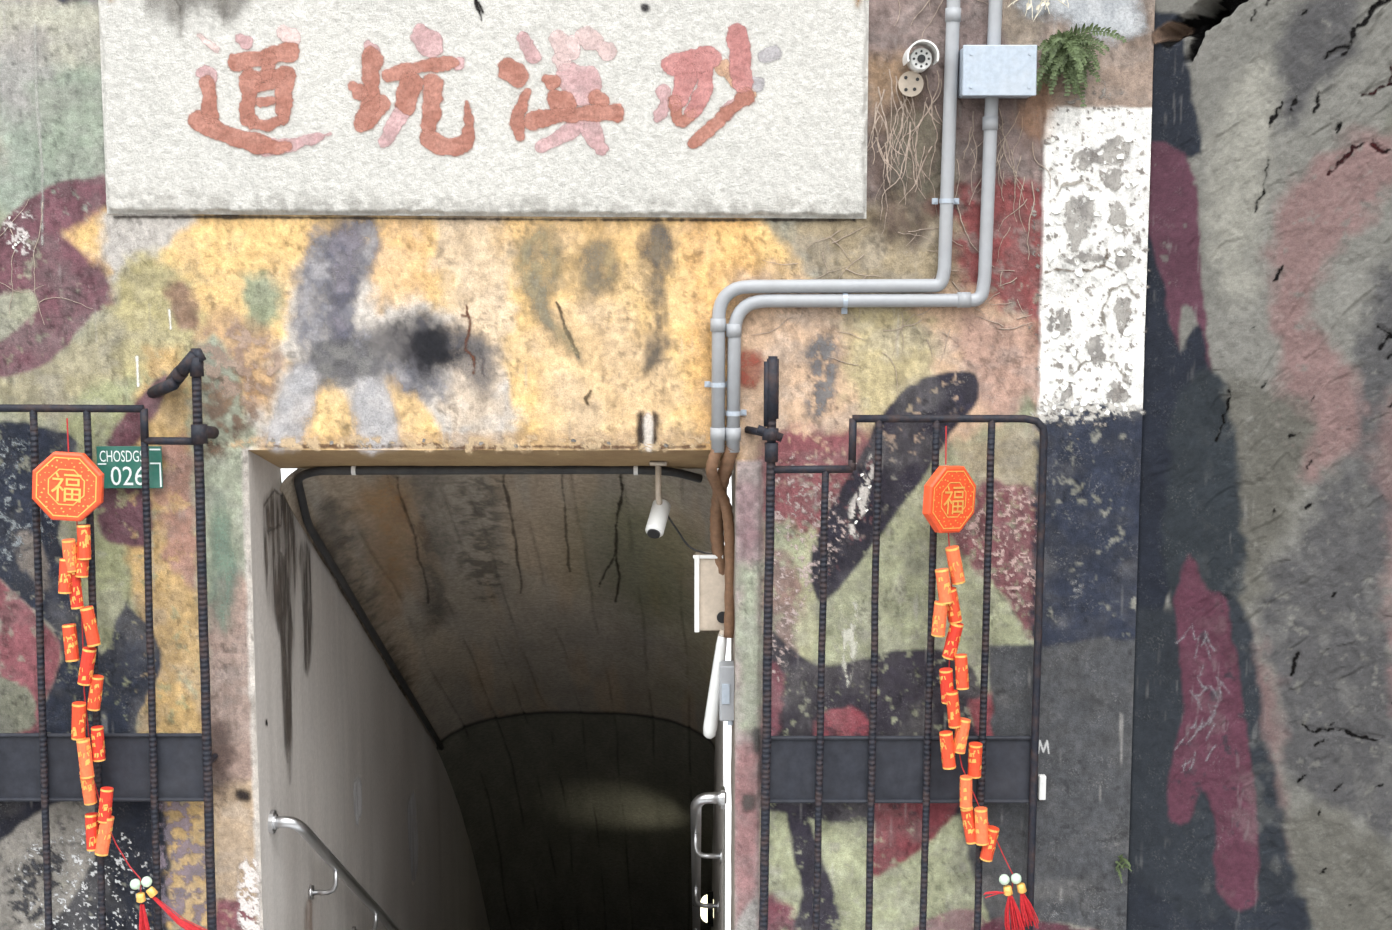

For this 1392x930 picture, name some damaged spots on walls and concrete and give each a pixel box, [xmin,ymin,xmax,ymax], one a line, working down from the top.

damp [153,0,244,18]
damp [267,219,493,452]
crack [461,305,485,377]
crack [555,302,579,356]
peeling [1029,81,1150,439]
crack [265,443,706,602]
damp [264,492,409,757]